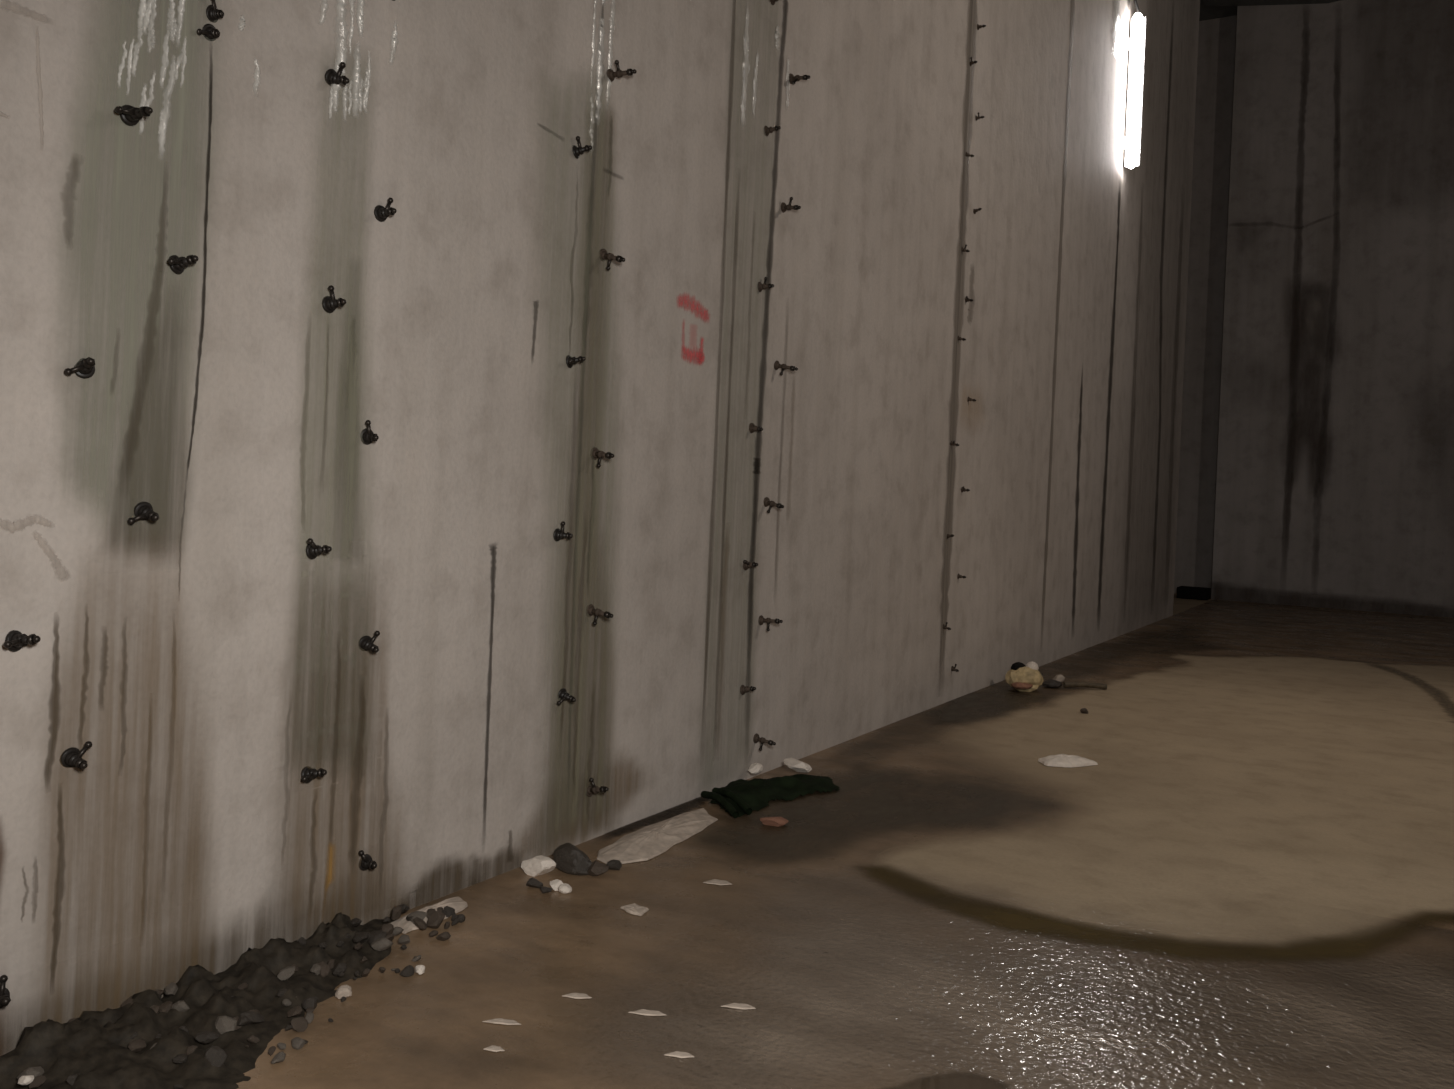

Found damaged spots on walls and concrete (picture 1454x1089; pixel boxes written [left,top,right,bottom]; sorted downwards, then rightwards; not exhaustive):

damp [81,0,198,539]
crack [188,71,212,466]
damp [42,308,369,1024]
damp [320,0,371,129]
crack [485,546,496,807]
damp [556,0,615,841]
crack [749,0,788,633]
damp [236,584,1454,1089]
crack [941,0,977,664]
damp [1284,291,1326,533]